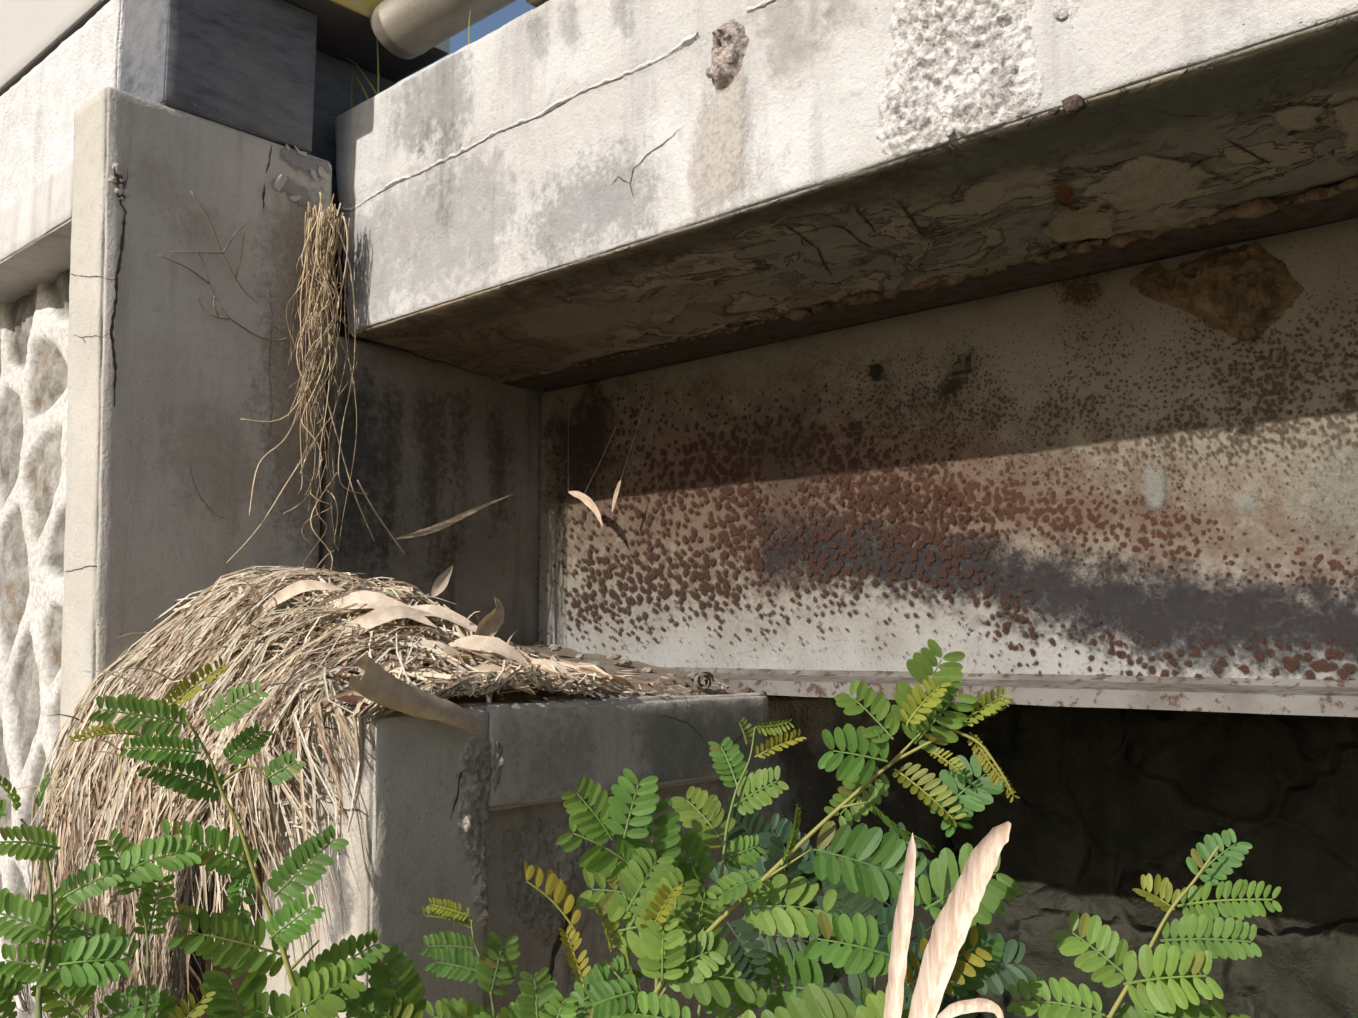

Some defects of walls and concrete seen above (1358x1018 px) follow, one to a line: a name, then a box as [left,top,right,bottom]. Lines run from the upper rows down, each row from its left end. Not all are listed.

crack [70,171,128,406]
peeling [274,143,331,209]
crack [339,35,700,212]
spalling [568,154,1358,371]
spalling [1048,94,1086,118]
peeling [1268,100,1358,153]
corrosion [535,265,1358,681]
water stain [761,515,1358,675]
spalling [455,736,622,1000]